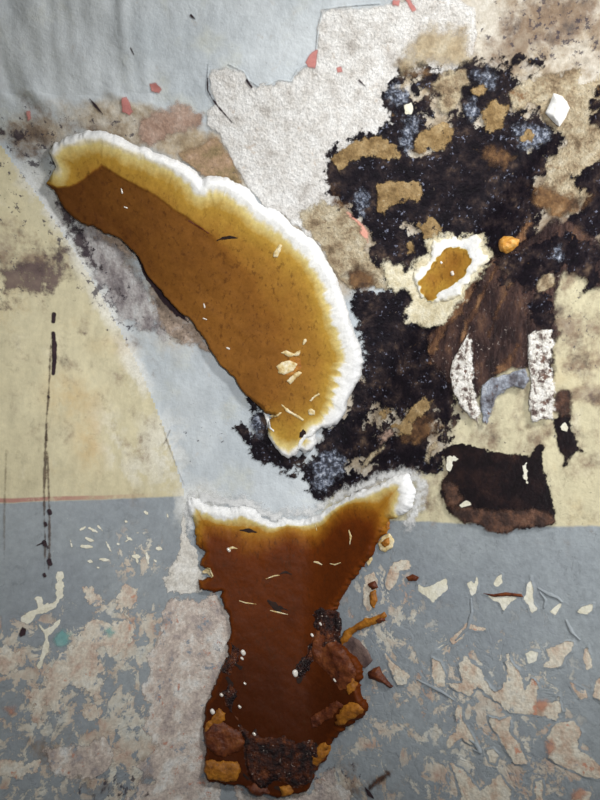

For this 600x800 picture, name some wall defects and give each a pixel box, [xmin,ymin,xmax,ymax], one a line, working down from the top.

spalling [139,0,486,290]
water stain [55,192,166,341]
water stain [231,27,600,531]
crack [37,312,57,577]
peeling [450,329,556,424]
peeling [0,736,113,781]
peeling [21,571,138,729]
flaking render [124,513,231,800]
peeling [361,557,413,614]
peeling [415,576,451,605]
peeling [464,564,565,618]
peeling [430,639,600,800]